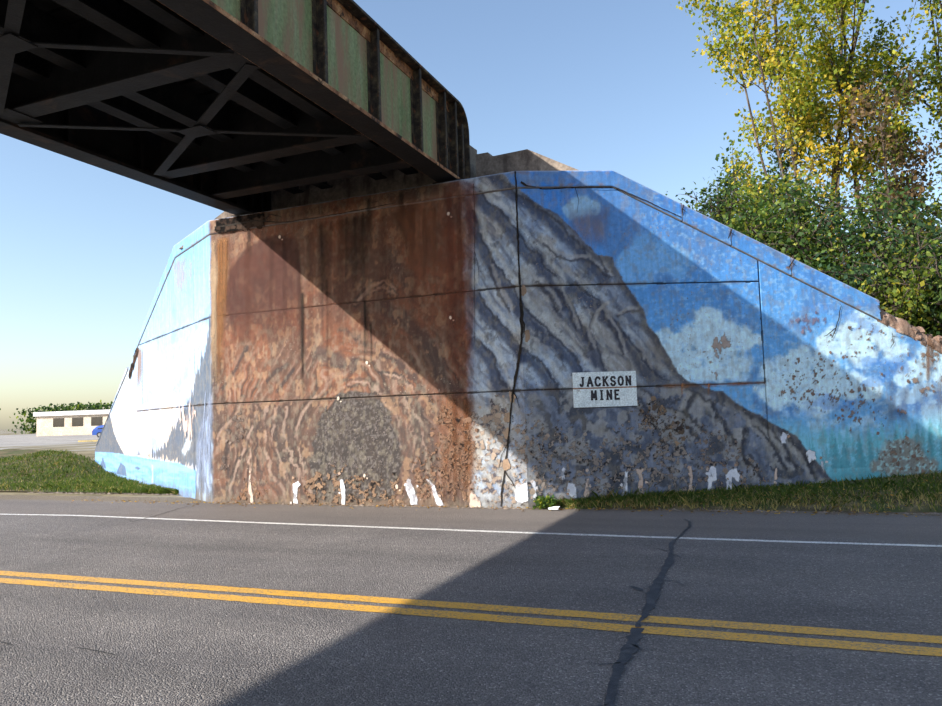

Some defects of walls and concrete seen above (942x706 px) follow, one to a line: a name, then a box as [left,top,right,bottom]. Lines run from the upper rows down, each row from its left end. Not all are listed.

rust [217,239,227,343]
crack [498,171,685,506]
spalling [779,309,942,435]
rust [453,398,473,470]
peeling [290,394,777,508]